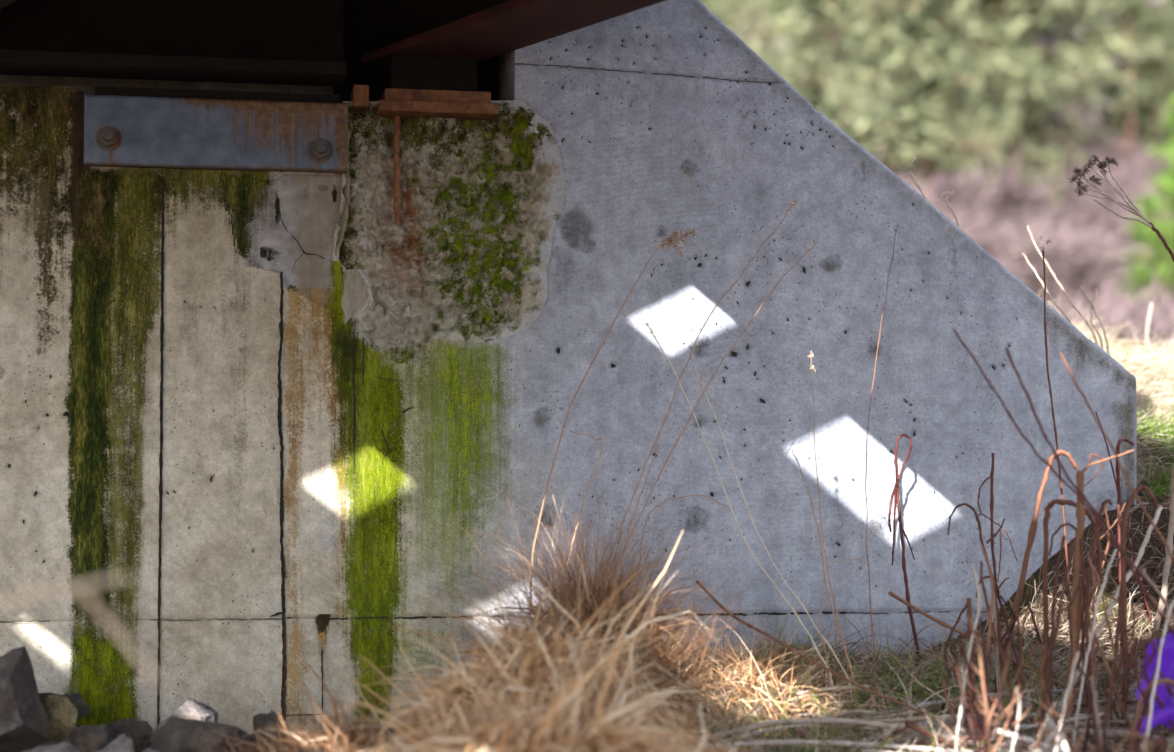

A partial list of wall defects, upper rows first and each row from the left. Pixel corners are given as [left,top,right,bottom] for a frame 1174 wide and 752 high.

leakage [218,172,266,244]
spalling [231,79,580,378]
crack [150,179,331,734]
rust [284,288,336,515]
crack [353,332,414,473]
leakage [315,268,505,728]
crack [0,617,122,625]
rust [285,622,307,724]
crack [321,613,516,621]